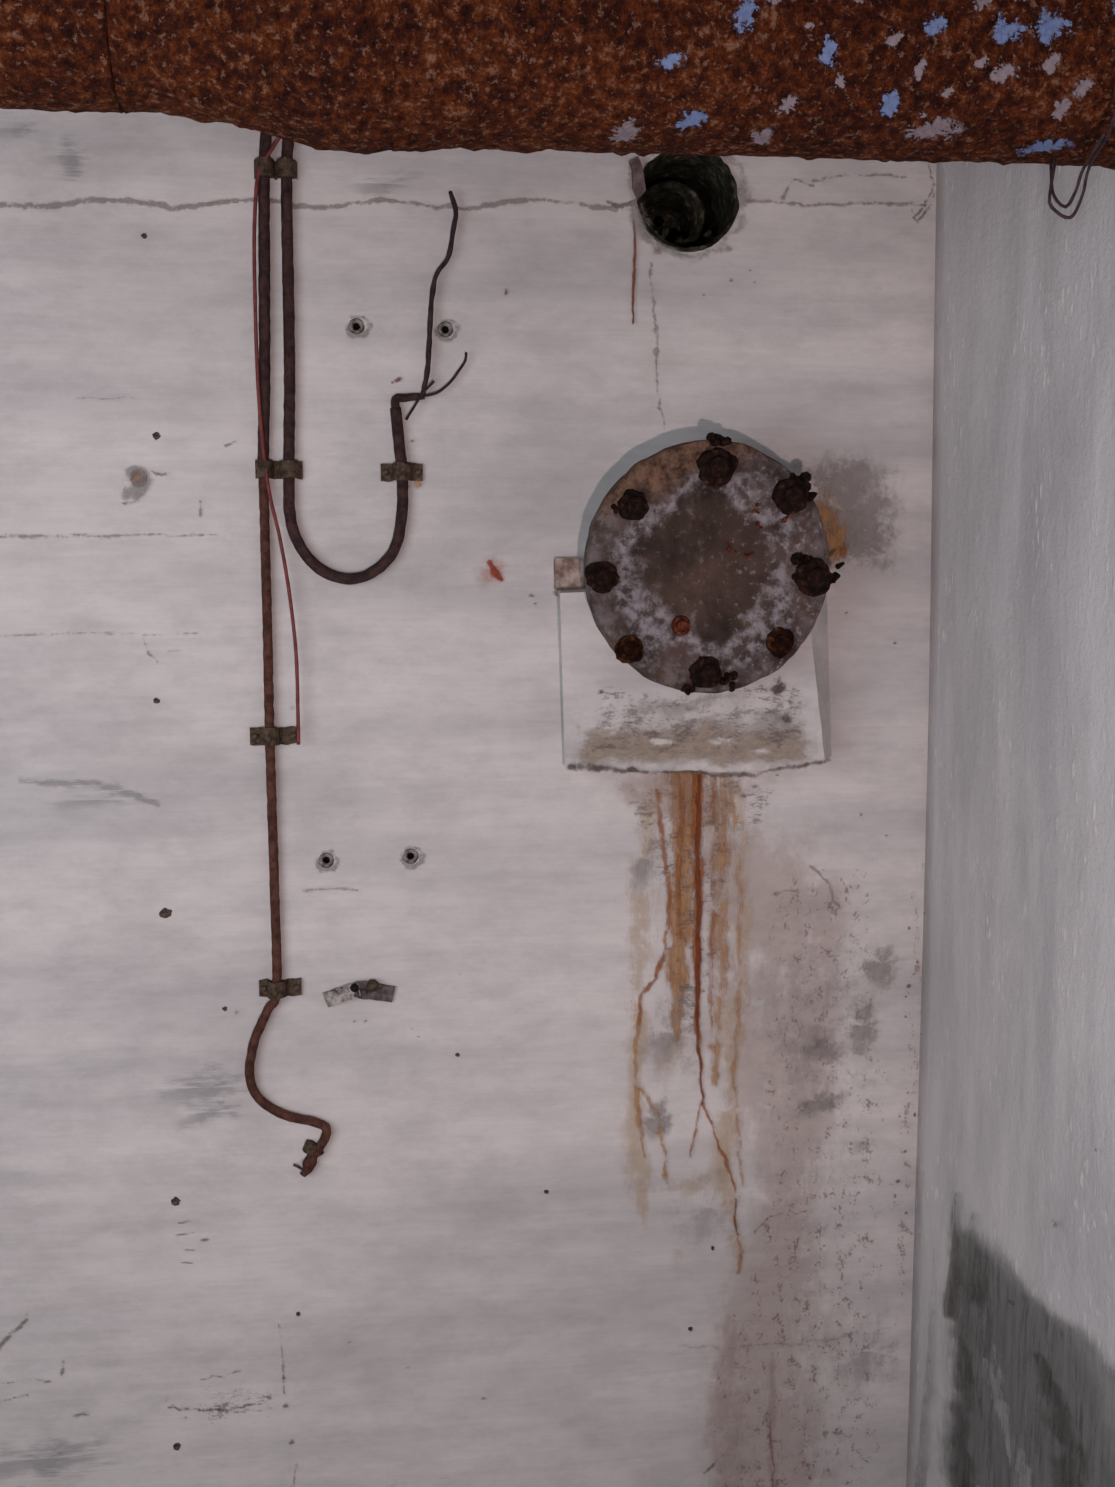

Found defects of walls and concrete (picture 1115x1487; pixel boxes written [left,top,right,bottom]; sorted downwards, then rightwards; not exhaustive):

crack [0,197,636,212]
crack [746,170,934,220]
rust [633,770,743,1274]
leakage [940,1193,1115,1487]